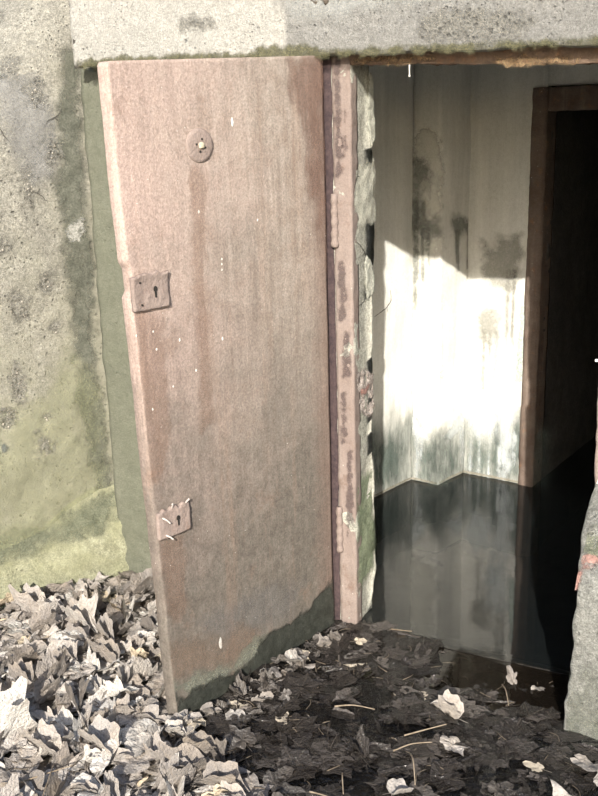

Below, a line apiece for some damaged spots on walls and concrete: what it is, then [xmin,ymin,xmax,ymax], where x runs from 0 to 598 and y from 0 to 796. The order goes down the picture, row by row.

rust [353,54,435,65]
rust [495,56,580,67]
water stain [0,49,116,564]
water stain [412,158,440,302]
water stain [452,216,468,269]
water stain [479,311,508,353]
water stain [484,236,521,309]
water stain [372,398,520,496]
water stain [175,584,335,713]